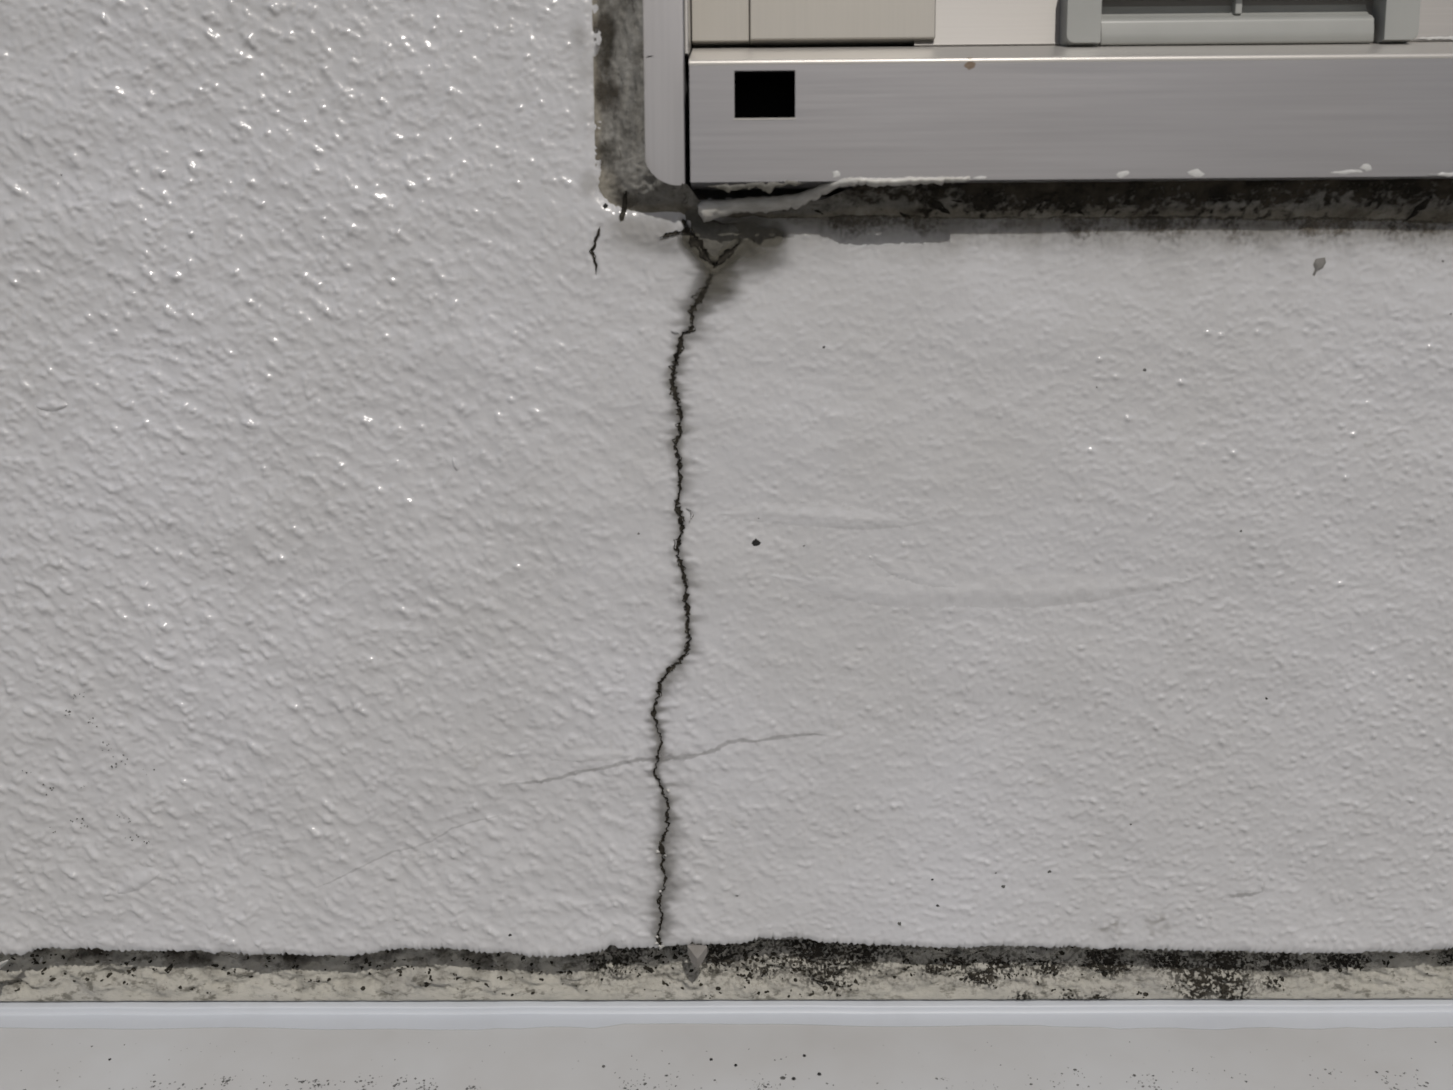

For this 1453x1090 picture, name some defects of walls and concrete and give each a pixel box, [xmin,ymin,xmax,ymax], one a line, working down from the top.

damp [594,15,620,107]
damp [829,178,1453,235]
damp [679,219,786,290]
crack [651,219,739,950]
damp [7,939,1395,1000]